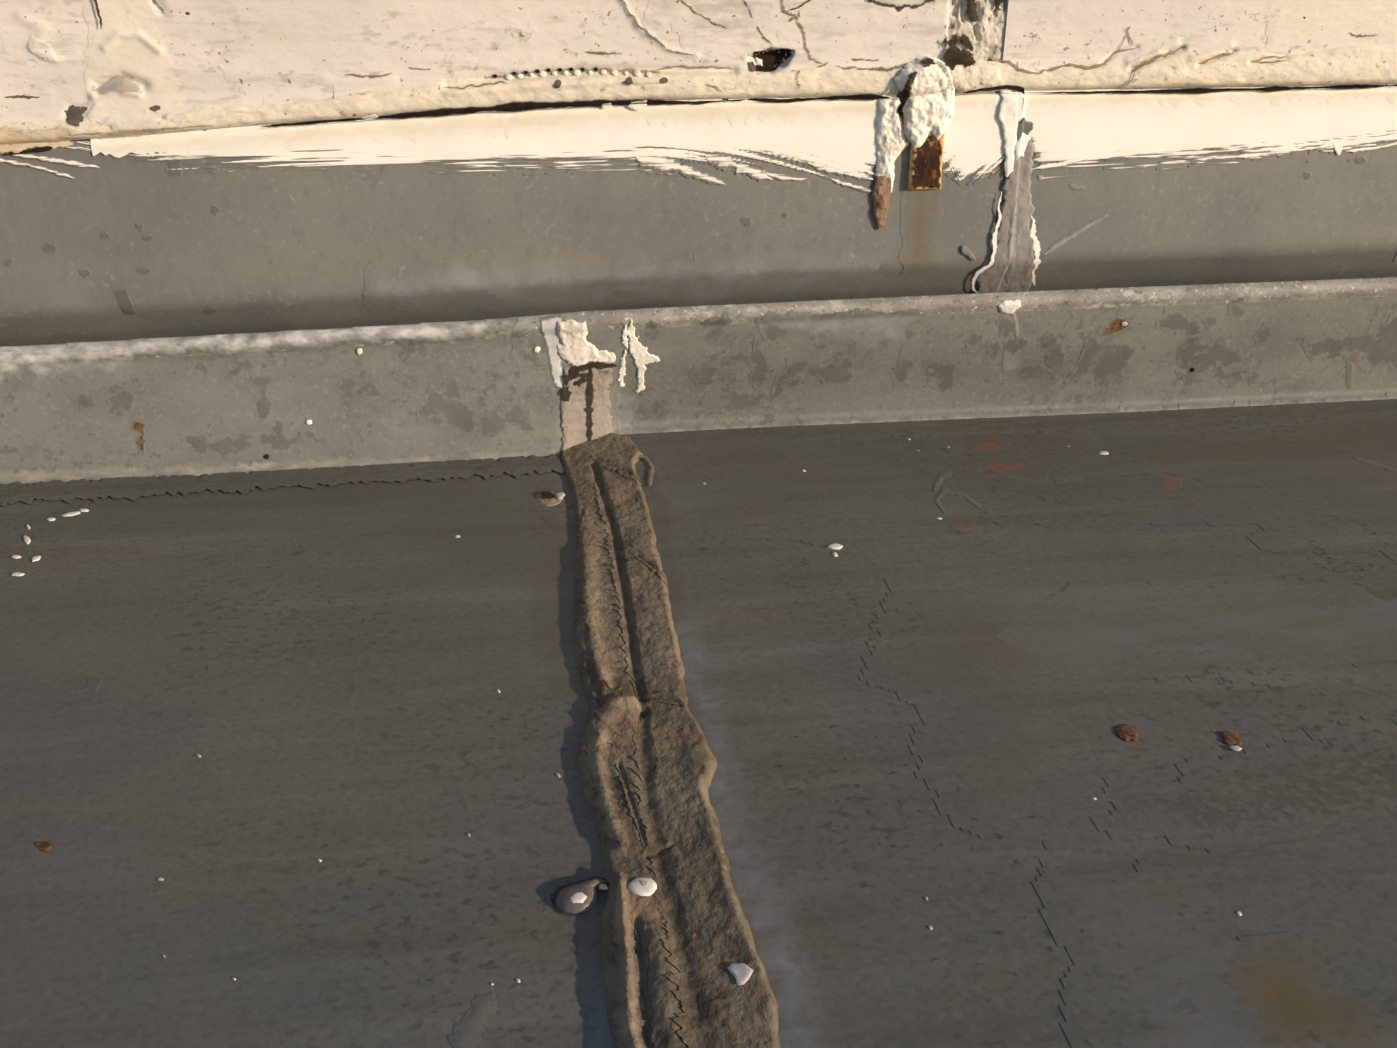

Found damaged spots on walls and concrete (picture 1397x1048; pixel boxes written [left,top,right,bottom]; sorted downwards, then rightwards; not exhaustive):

leakage [960,0,979,51]
leakage [994,0,1271,70]
crack [262,0,1397,146]
peeling [602,100,647,111]
peeling [1017,117,1033,140]
leakage [0,236,1397,1048]
corrosion [1115,724,1139,741]
corrosion [1220,731,1242,747]